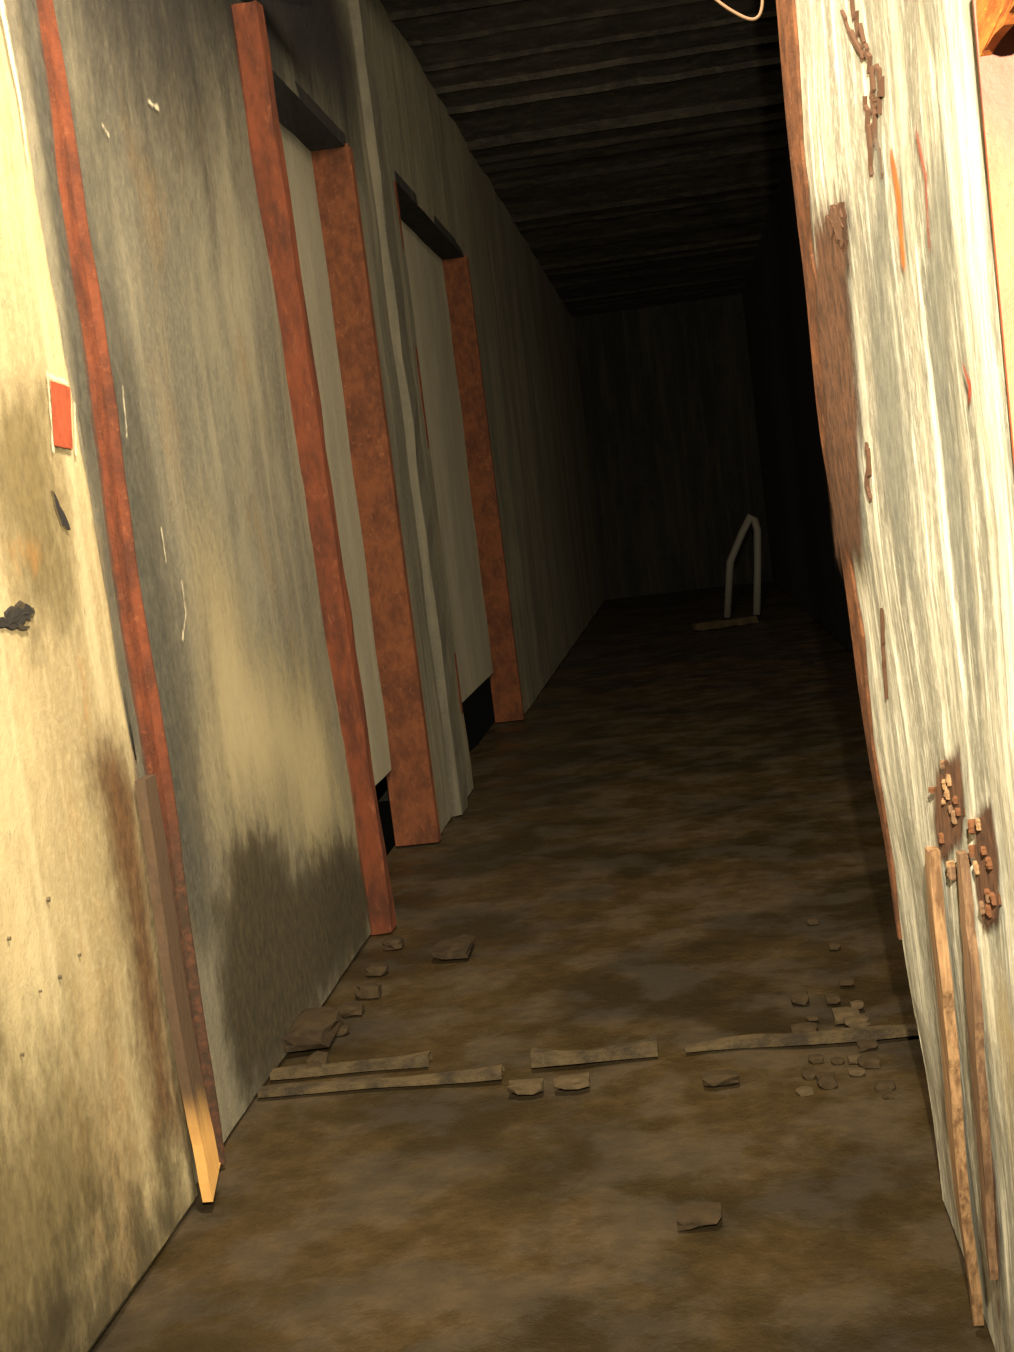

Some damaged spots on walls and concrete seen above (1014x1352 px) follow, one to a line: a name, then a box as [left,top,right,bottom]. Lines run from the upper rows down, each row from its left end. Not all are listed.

damp [0,402,71,614]
crack [0,600,35,631]